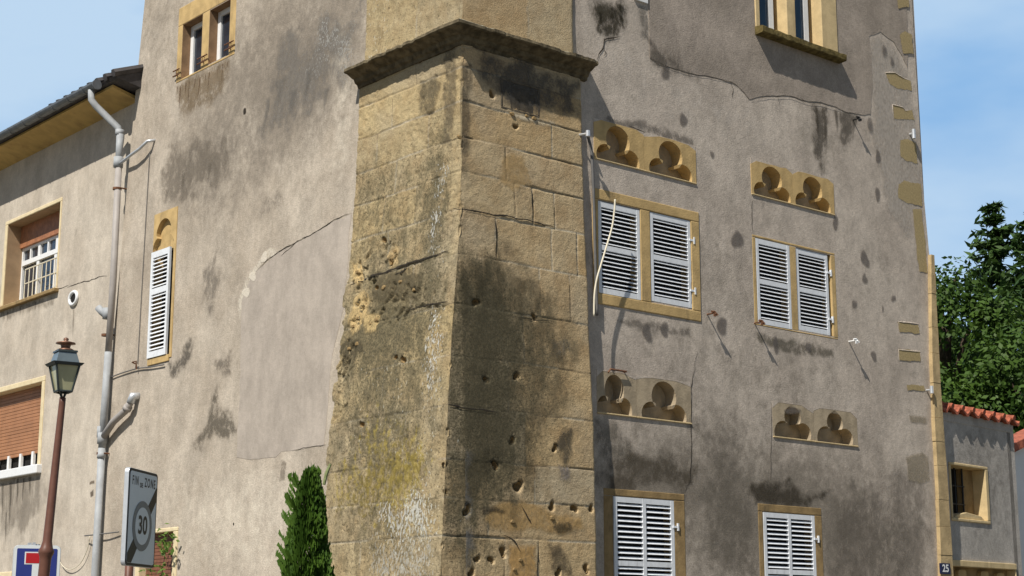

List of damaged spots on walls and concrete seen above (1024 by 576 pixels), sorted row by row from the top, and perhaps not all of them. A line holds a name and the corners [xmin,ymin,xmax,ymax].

water stain [593,3,626,37]
water stain [814,109,855,168]
crack [263,213,351,264]
spalling [340,246,421,367]
water stain [169,340,191,376]
water stain [198,397,234,443]